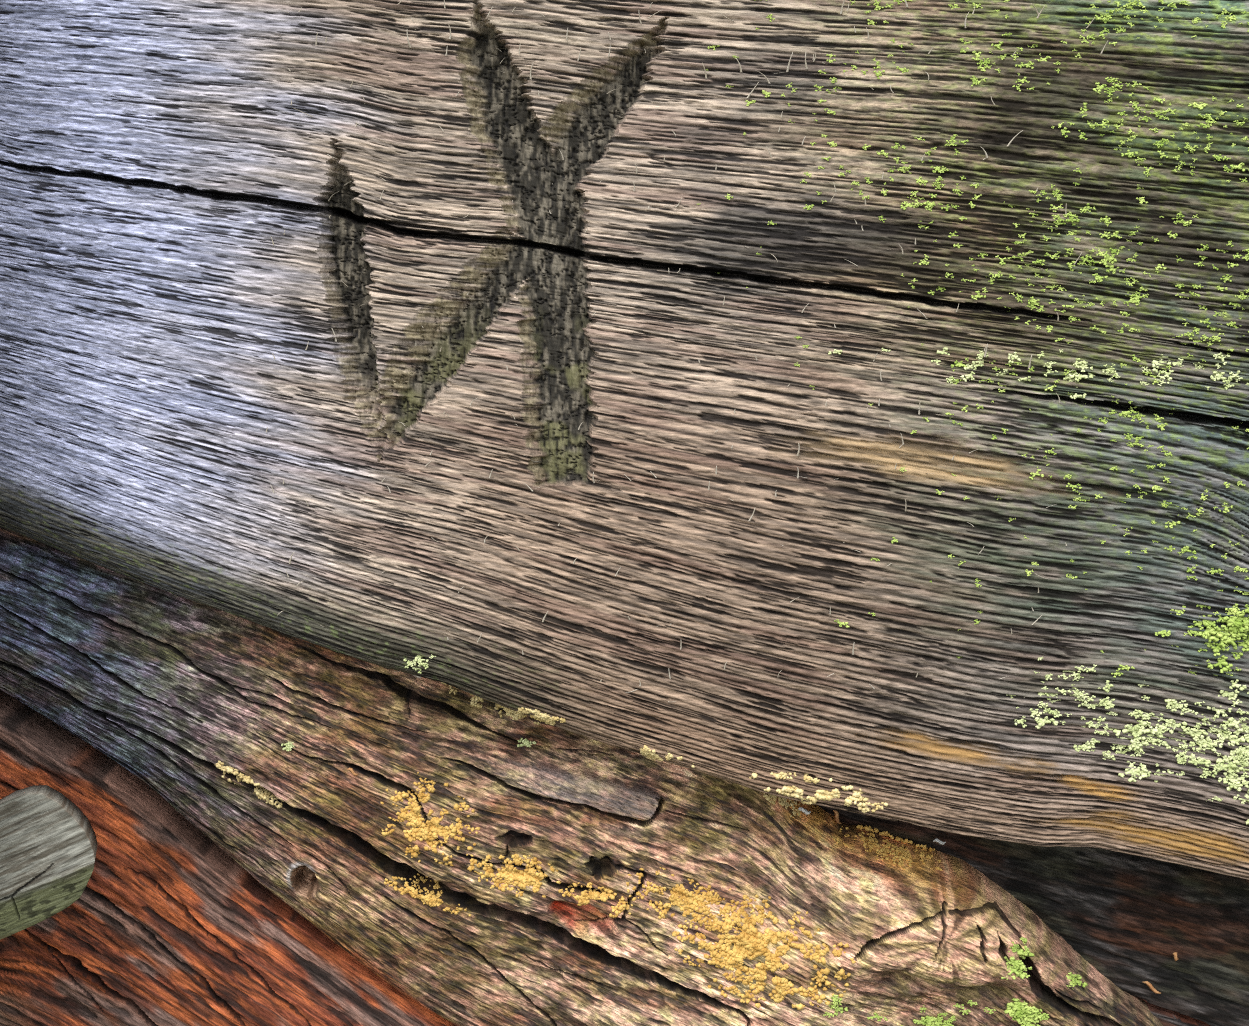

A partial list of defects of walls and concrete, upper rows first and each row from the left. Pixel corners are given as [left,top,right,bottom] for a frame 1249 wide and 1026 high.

crack [0,159,1096,323]
crack [1139,334,1249,359]
crack [992,388,1249,436]
crack [0,568,754,1026]
crack [853,900,1122,1026]
crack [1132,995,1211,1026]